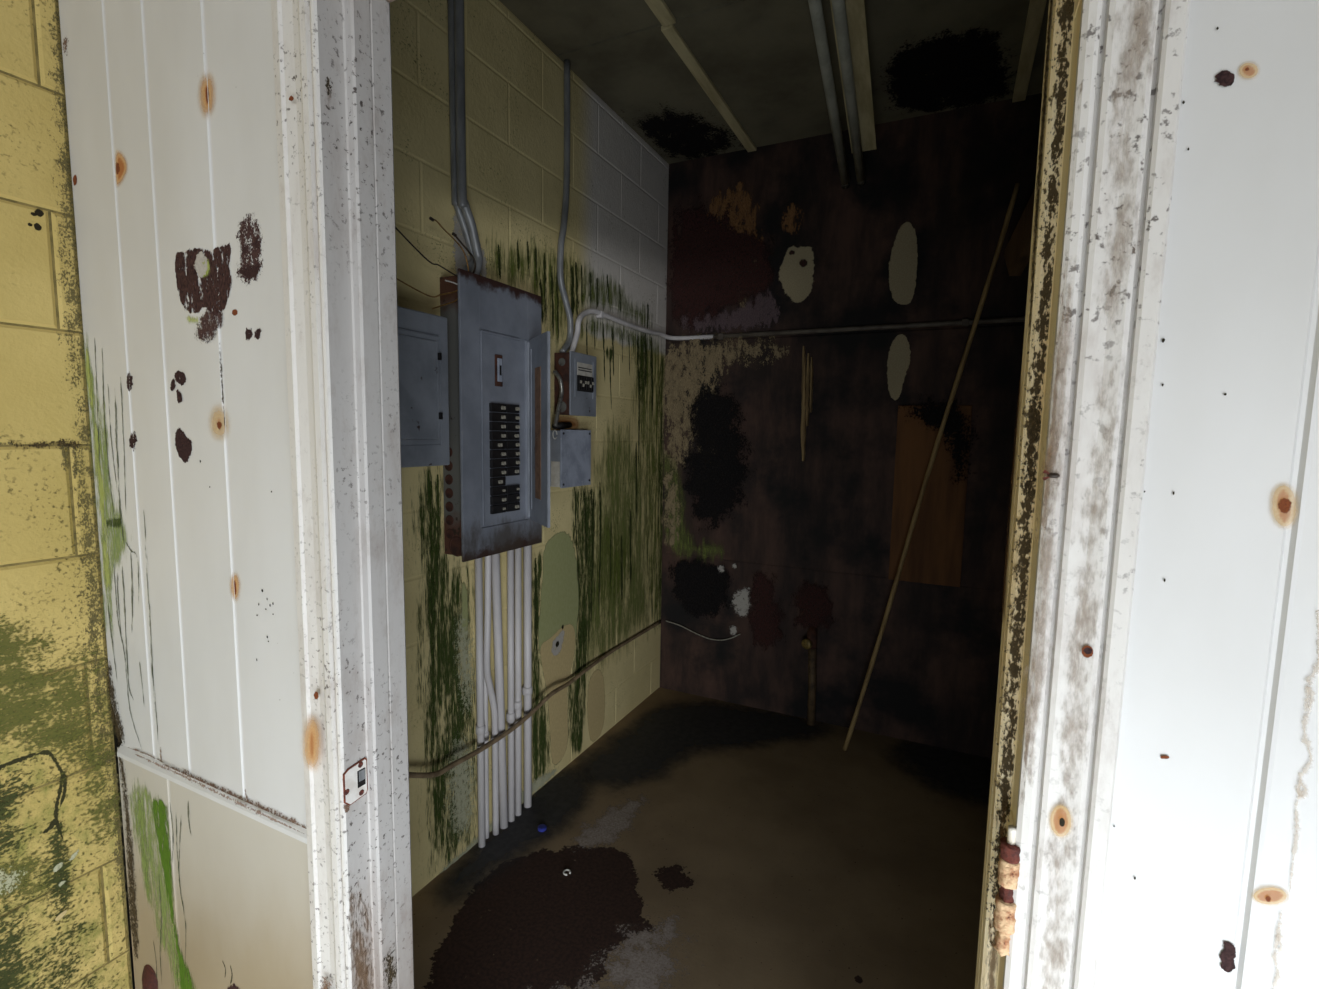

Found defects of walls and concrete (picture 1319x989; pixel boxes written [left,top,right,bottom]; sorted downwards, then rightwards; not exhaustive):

rust [116,153,126,184]
peeling [175,214,263,344]
peeling [662,203,815,474]
peeling [888,222,918,305]
leakage [0,0,162,980]
leakage [517,240,653,707]
leakage [880,0,1082,989]
rust [1273,486,1295,526]
leakage [348,885,397,989]
leakage [422,702,823,989]
rust [1051,806,1071,836]
rust [1254,888,1286,904]